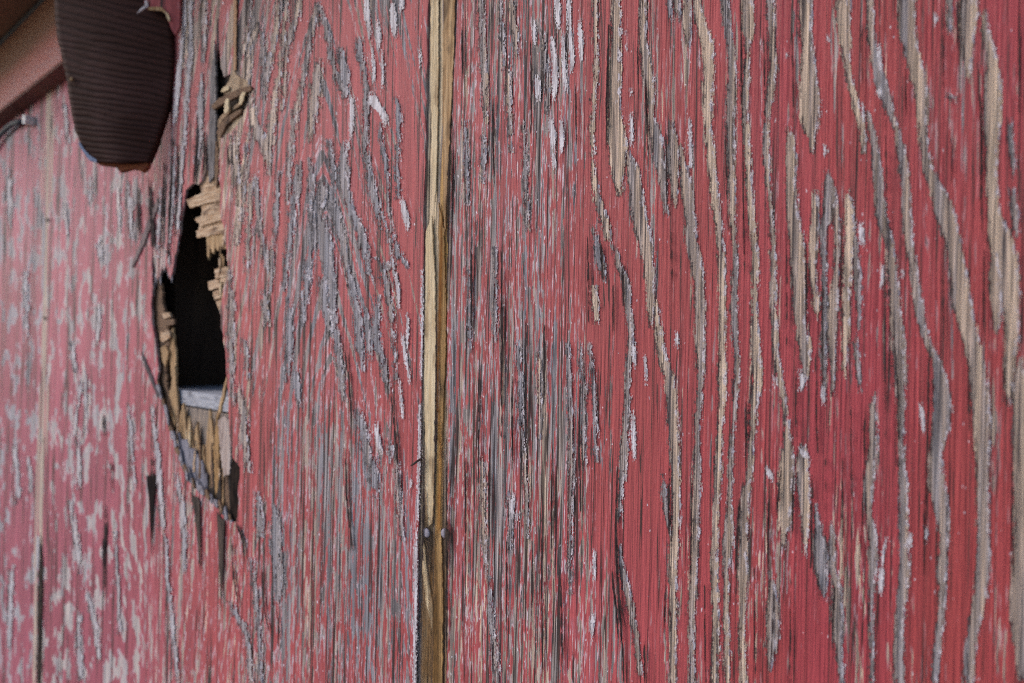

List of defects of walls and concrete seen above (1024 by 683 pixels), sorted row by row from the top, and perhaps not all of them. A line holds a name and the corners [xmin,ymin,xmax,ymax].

spalling [98,162,151,239]
peeling [154,0,424,683]
peeling [461,0,992,683]
peeling [933,0,1024,683]
peeling [11,443,33,504]
peeling [68,340,90,575]
peeling [126,403,136,488]
peeling [5,565,15,650]
peeling [74,588,102,683]
peeling [111,530,122,635]